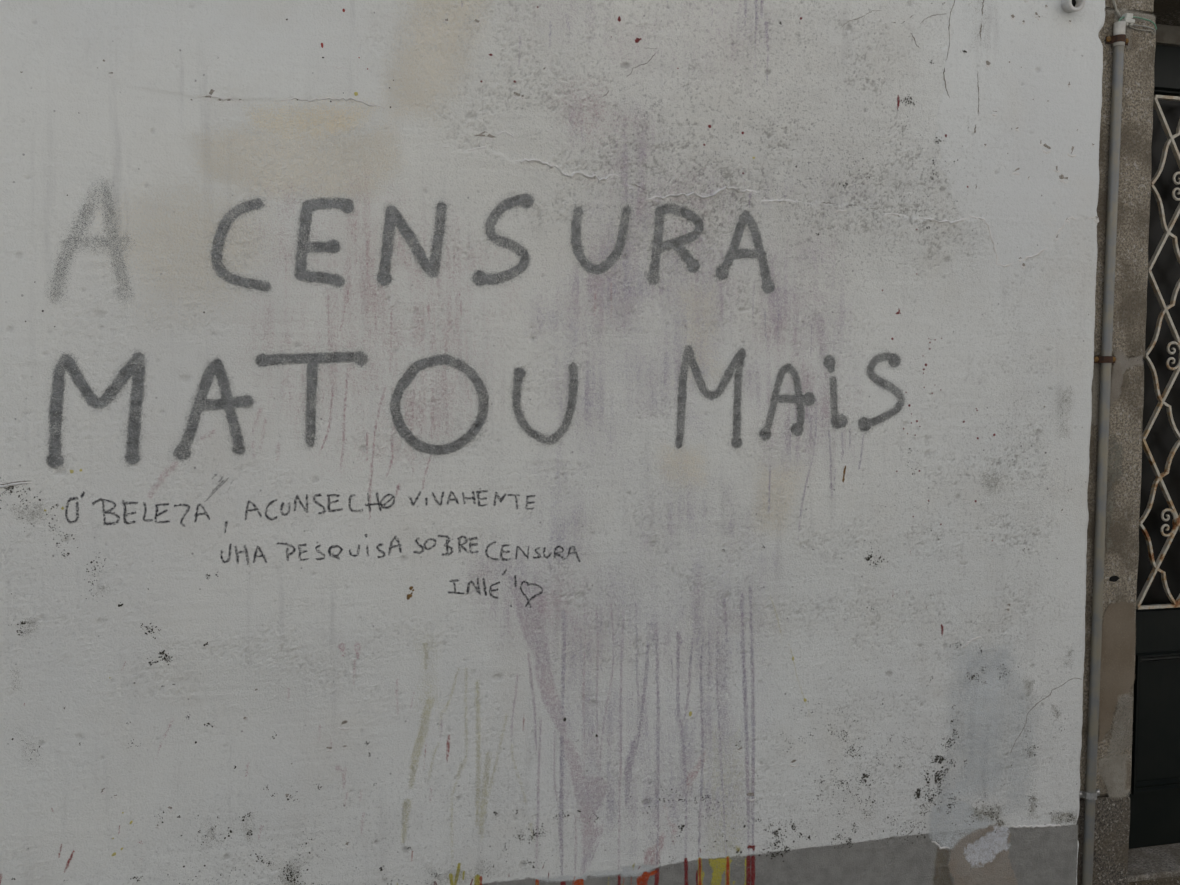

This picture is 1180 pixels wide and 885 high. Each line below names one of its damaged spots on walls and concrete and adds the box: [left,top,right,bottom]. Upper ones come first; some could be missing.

crack [841,0,984,97]
peeling [932,813,1061,885]